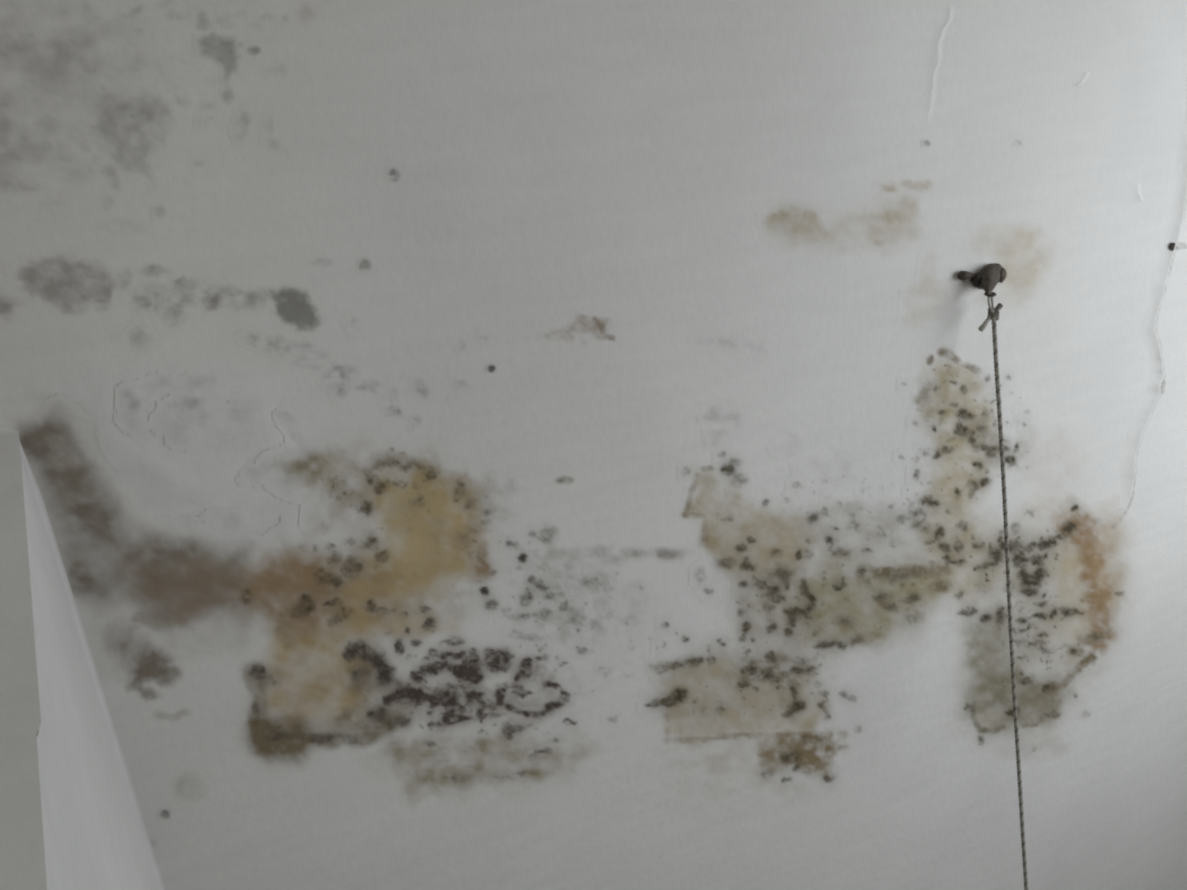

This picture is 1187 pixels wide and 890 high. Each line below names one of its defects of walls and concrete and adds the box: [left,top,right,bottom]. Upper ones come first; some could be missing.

mould [0,0,293,241]
crack [1111,77,1187,531]
leakage [3,338,1149,829]